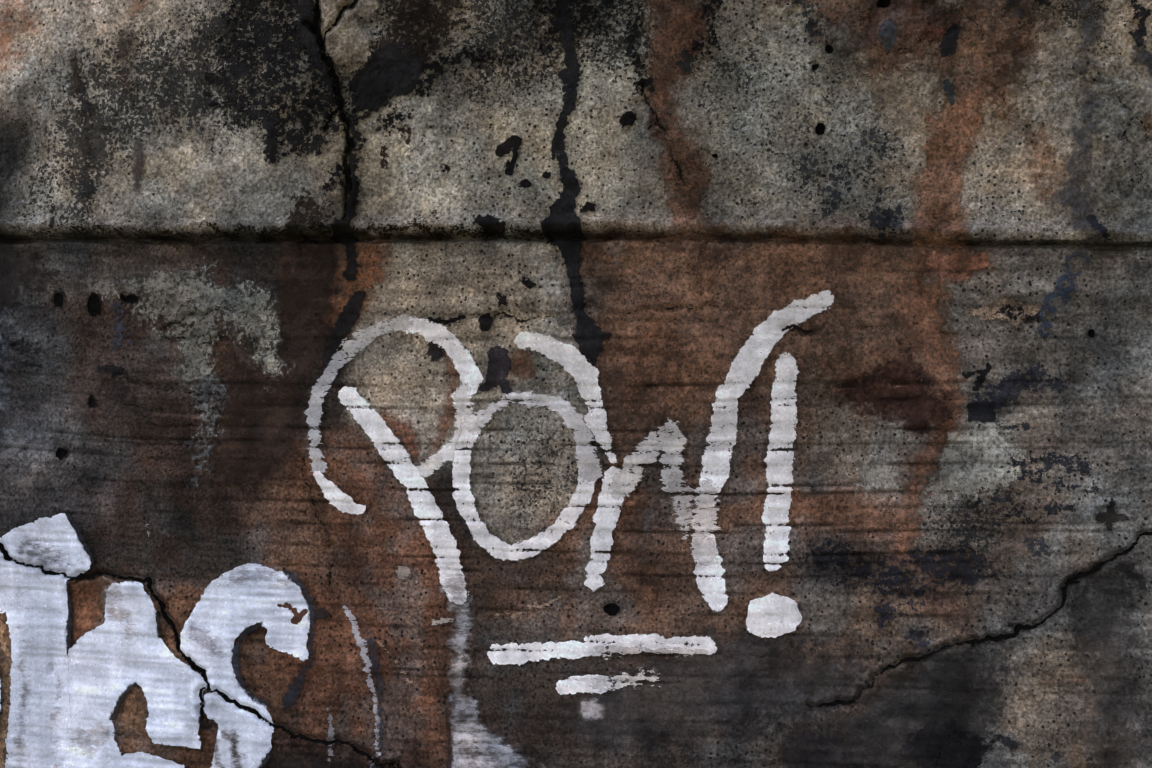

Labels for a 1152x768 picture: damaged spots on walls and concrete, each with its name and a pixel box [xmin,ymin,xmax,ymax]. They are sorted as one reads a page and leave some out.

crack [304,0,358,218]
leakage [198,0,521,236]
leakage [525,0,656,97]
leakage [674,0,729,76]
corrosion [583,0,1070,621]
crack [0,543,400,768]
crack [301,456,335,586]
crack [809,531,1152,708]